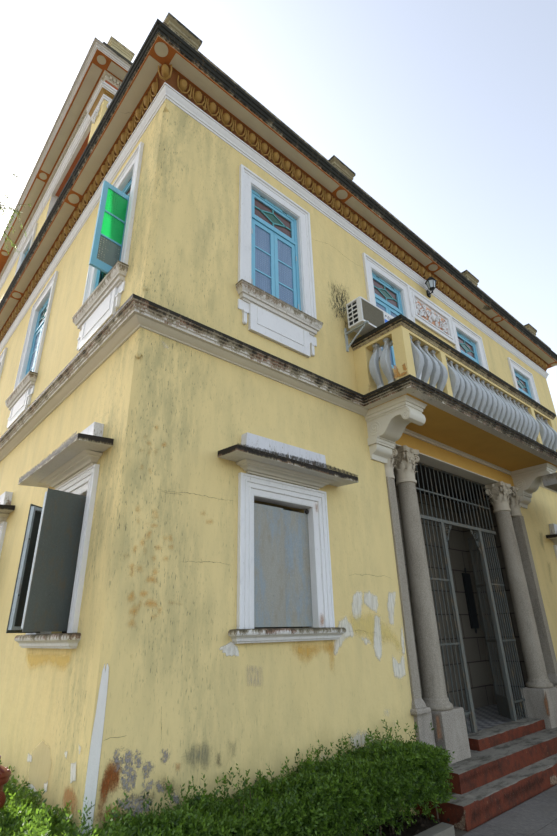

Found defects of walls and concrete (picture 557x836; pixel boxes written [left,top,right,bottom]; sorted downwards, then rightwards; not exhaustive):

damp [334,286,347,317]
peeling [334,591,382,659]
peeling [393,630,405,678]
corrosion [99,764,119,817]
flaking render [114,749,179,817]